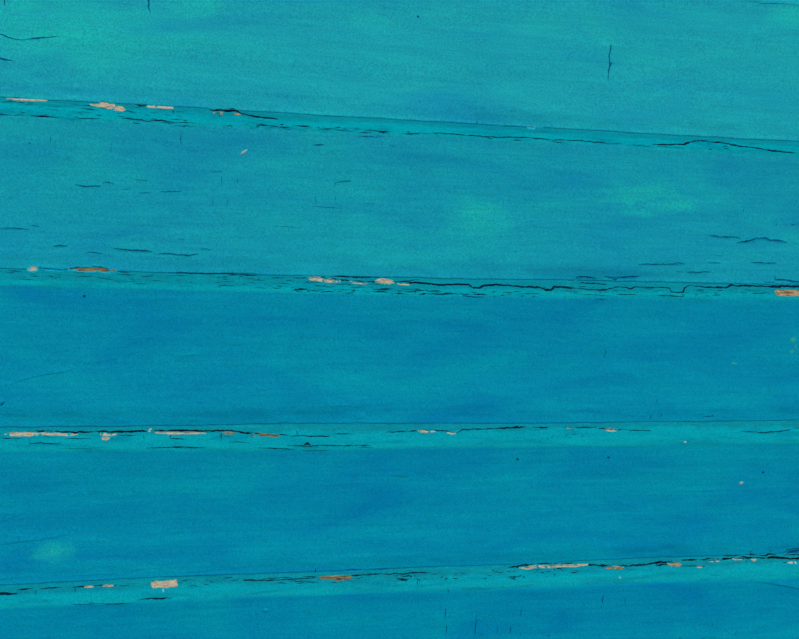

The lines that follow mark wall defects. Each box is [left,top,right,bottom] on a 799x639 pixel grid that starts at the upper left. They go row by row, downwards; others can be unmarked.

peeling [82,101,174,114]
crack [229,124,617,146]
crack [637,139,796,154]
crack [0,224,40,232]
crack [53,224,799,300]
peeling [296,275,434,287]
peeling [773,288,799,298]
peeling [0,428,331,441]
peeling [519,562,589,573]
peeling [150,578,179,590]